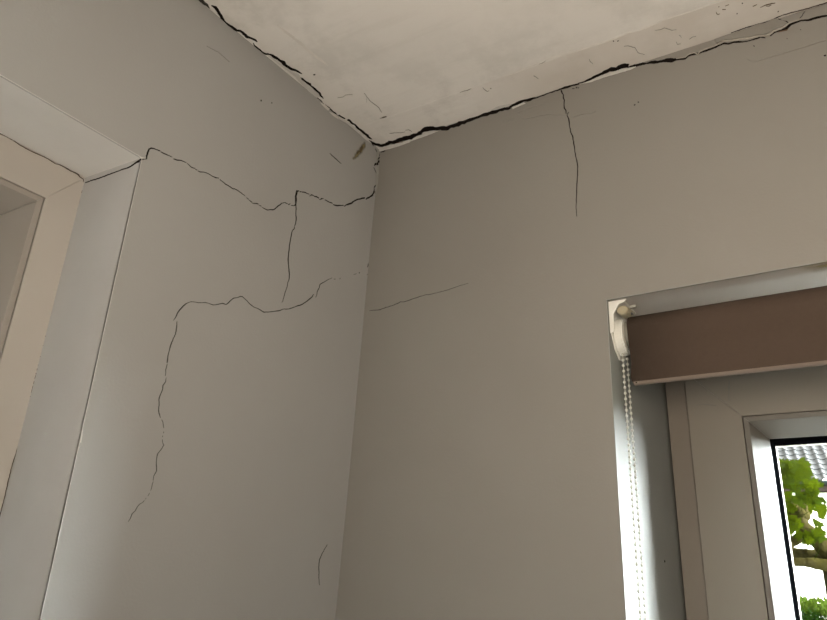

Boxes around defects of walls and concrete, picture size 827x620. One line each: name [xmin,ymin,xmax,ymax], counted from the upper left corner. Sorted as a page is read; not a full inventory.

crack [85,0,827,520]